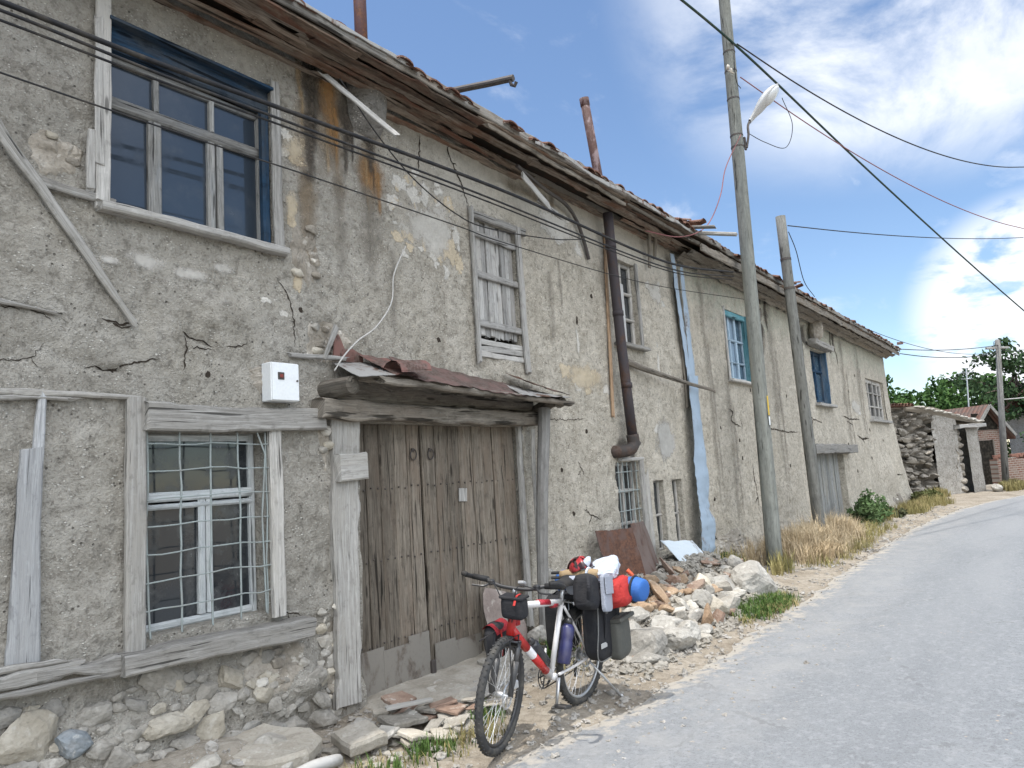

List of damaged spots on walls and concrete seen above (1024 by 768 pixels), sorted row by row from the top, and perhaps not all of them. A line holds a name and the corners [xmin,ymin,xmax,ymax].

spalling [28,129,84,176]
rust [321,72,339,165]
leakage [300,61,374,238]
peeling [386,169,463,280]
crack [102,318,131,329]
crack [86,331,245,373]
crack [276,277,296,347]